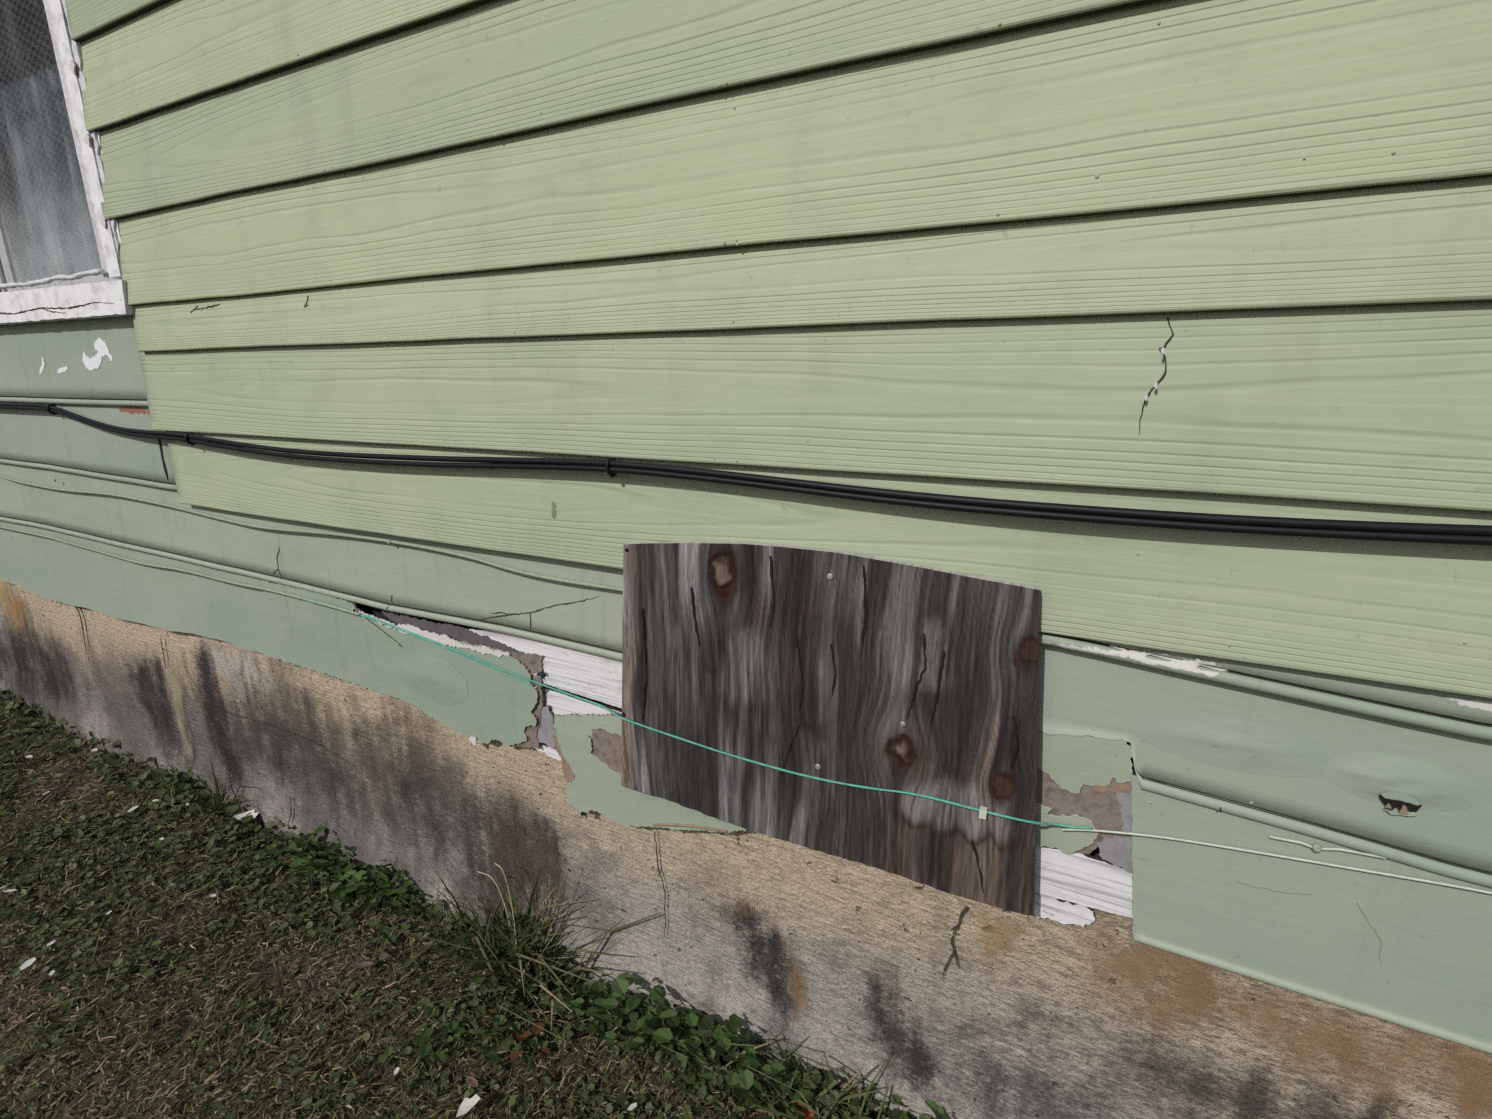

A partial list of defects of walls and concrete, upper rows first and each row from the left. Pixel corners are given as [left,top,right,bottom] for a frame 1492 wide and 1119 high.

crack [1139,317,1174,434]
damp [128,647,267,782]
peeling [537,705,556,749]
peeling [1036,731,1133,874]
damp [732,904,800,1020]
damp [870,988,934,1090]